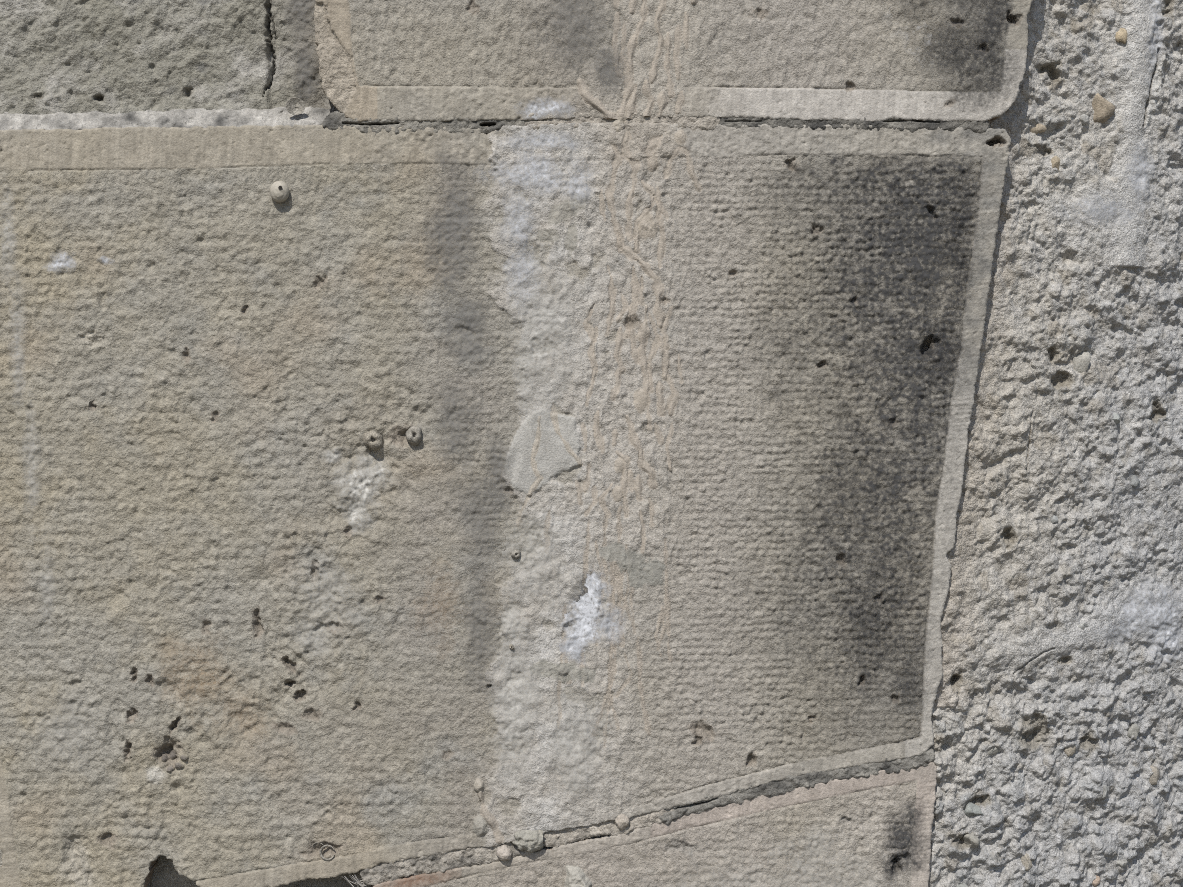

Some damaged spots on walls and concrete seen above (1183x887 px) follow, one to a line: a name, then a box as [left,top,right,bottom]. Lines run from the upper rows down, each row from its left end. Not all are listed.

crack [264,0,277,91]
water stain [501,0,702,555]
water stain [561,572,618,659]
spalling [125,708,138,723]
water stain [492,658,534,761]
spalling [97,833,119,849]